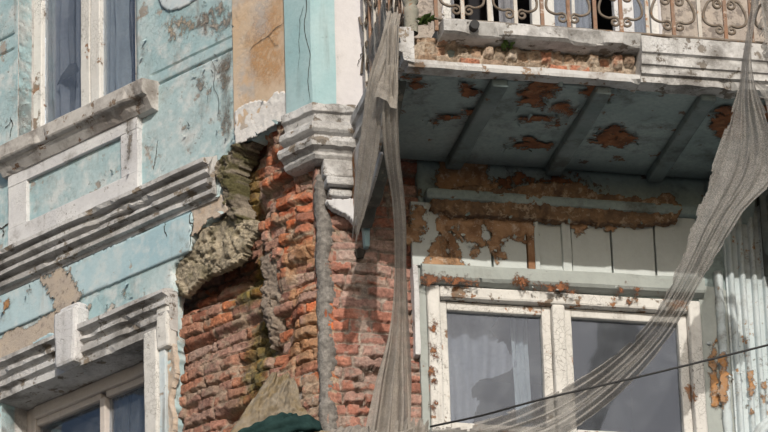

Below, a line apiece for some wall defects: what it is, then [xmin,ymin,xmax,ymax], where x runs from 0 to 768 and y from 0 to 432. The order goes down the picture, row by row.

peeling [165,1,234,41]
peeling [216,91,286,144]
crack [250,0,310,97]
spalling [414,37,636,130]
peeling [503,137,554,152]
peeling [588,124,639,149]
peeling [0,264,91,358]
spalling [175,194,289,352]
peeling [406,203,535,287]
spalling [707,338,768,415]